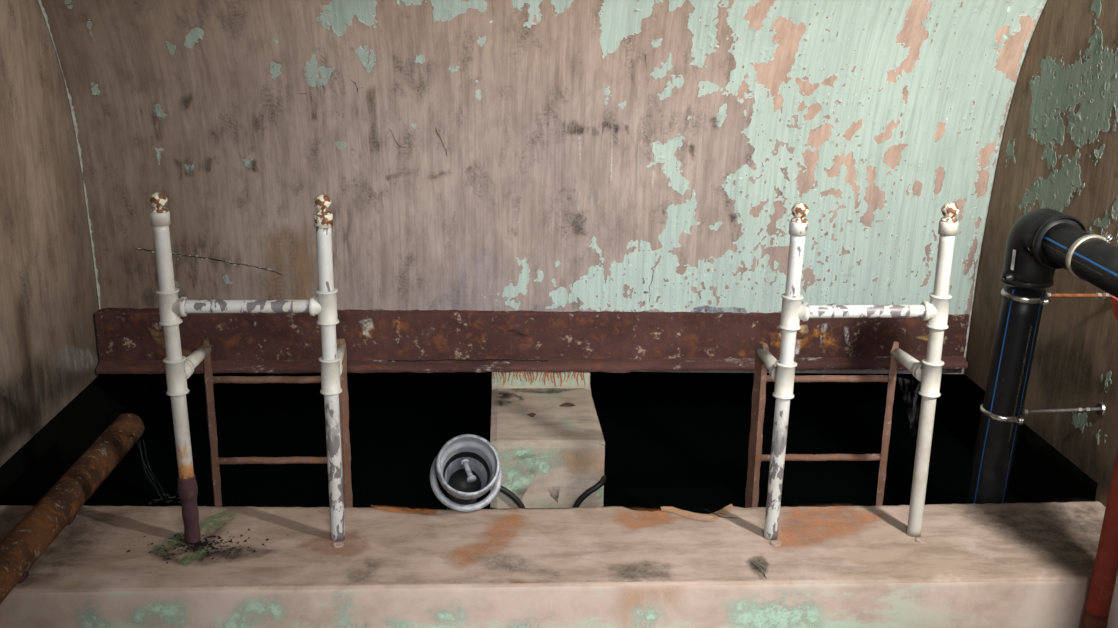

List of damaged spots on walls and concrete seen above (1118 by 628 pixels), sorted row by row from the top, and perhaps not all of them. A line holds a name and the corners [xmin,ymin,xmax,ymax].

peeling [316,0,377,36]
peeling [397,0,493,23]
peeling [166,28,204,55]
peeling [304,54,334,89]
spalling [38,0,101,310]
peeling [482,0,1118,359]
corrosion [492,371,589,387]
peeling [1072,412,1107,445]
damp [750,557,768,571]